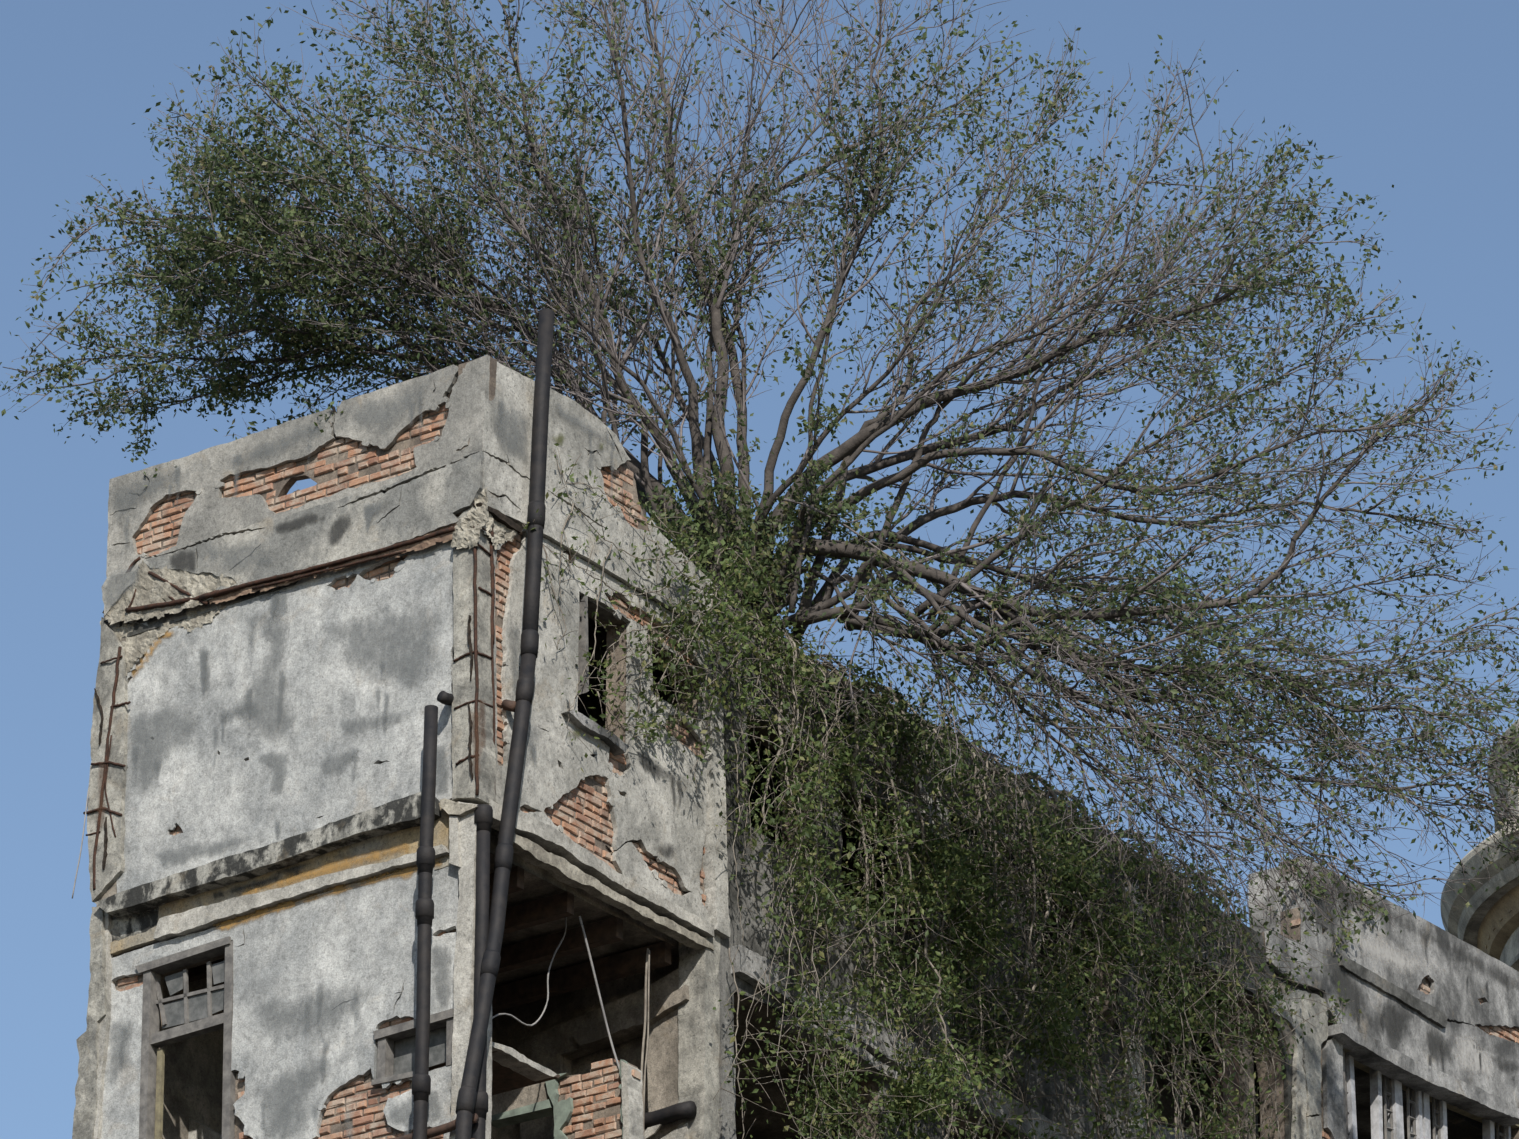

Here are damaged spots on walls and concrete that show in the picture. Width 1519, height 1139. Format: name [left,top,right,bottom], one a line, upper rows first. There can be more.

flaking render [588,453,647,529]
water stain [223,589,287,728]
flaking render [83,402,524,890]
flaking render [518,752,627,871]
flaking render [632,842,706,906]
water stain [1356,922,1510,997]
water stain [1428,1031,1517,1074]
flaking render [235,1068,253,1139]
flaking render [317,1072,413,1139]